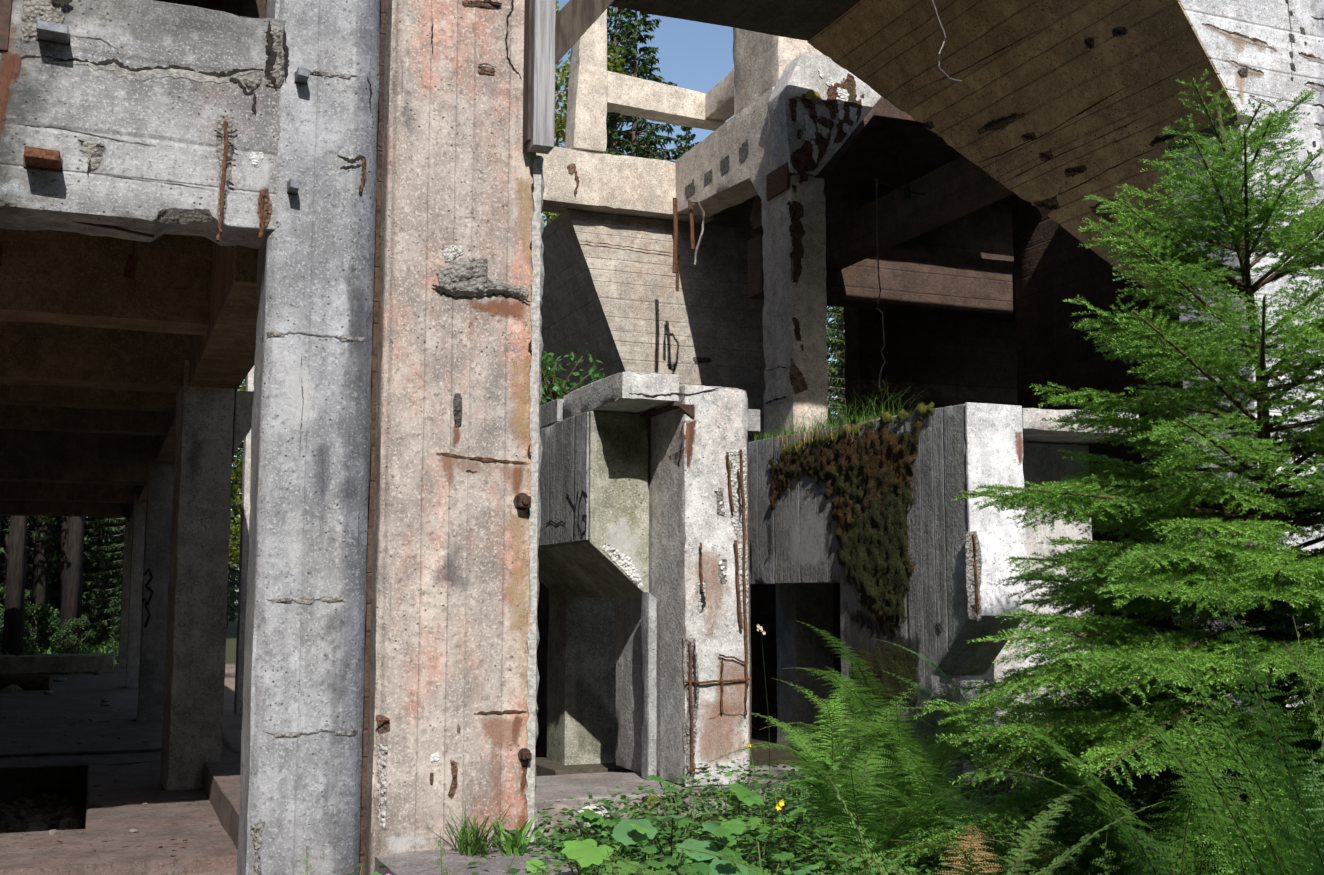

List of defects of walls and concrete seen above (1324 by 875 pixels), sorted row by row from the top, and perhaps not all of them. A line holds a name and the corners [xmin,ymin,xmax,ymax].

rust [0,28,21,128]
crack [20,35,264,115]
spalling [264,20,290,87]
crack [505,0,522,79]
peeling [787,64,865,283]
spalling [430,155,545,842]